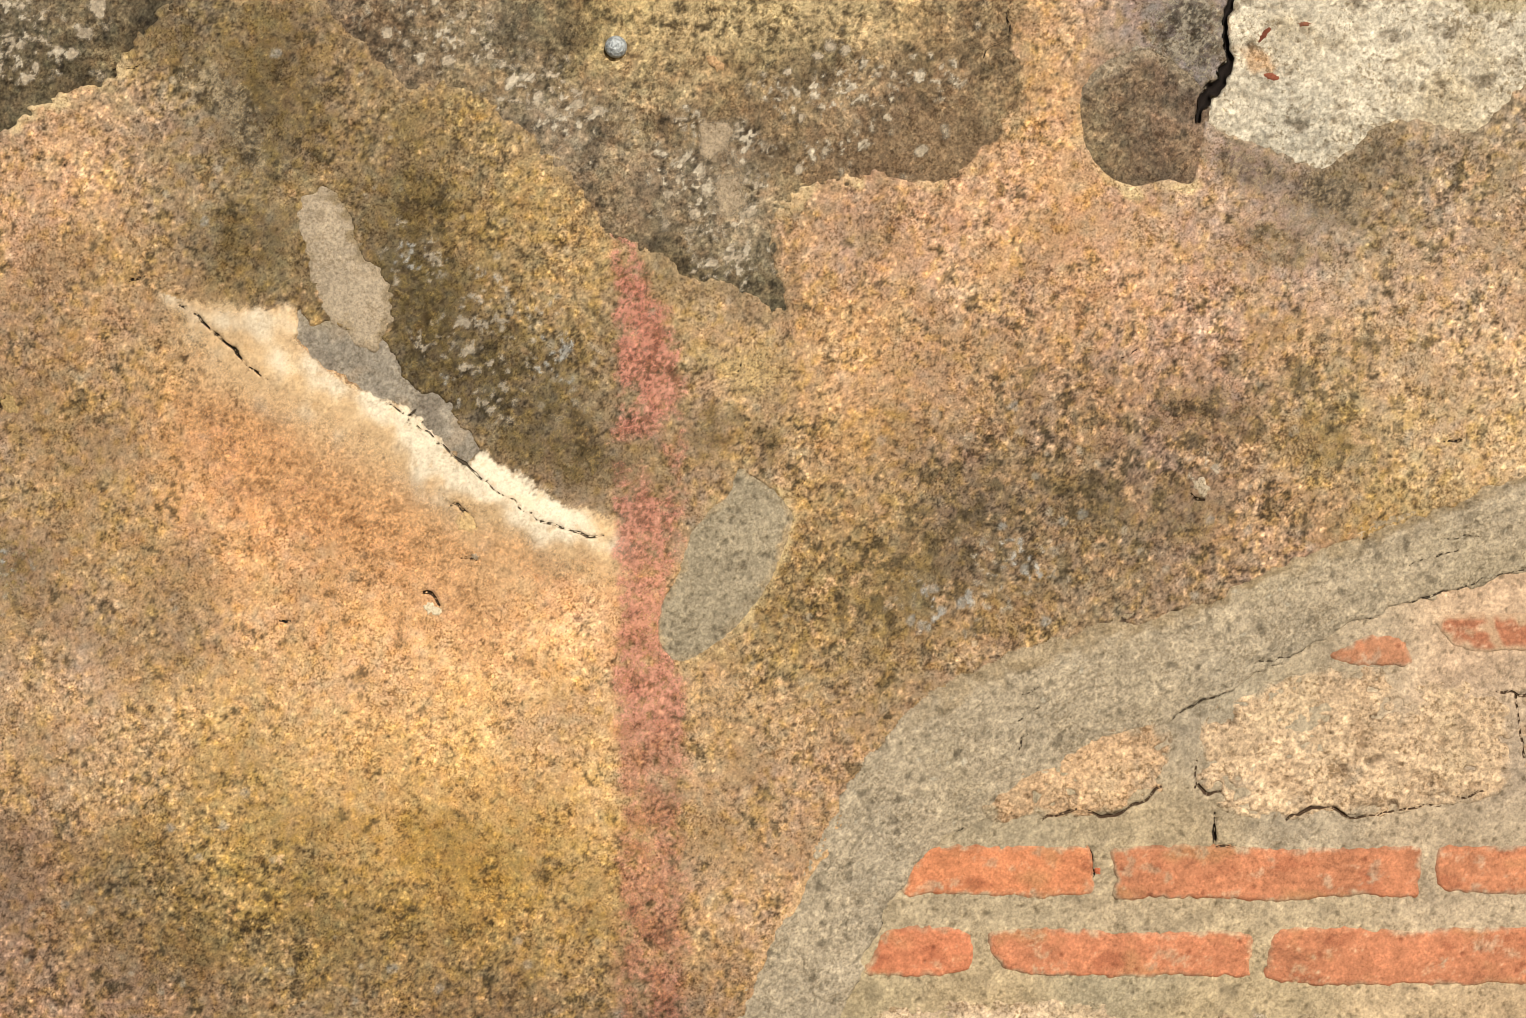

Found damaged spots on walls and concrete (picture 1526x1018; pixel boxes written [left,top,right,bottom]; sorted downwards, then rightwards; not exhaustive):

flaking render [0,0,174,132]
flaking render [318,0,1022,312]
crack [1196,0,1234,123]
flaking render [1080,0,1526,186]
flaking render [296,309,479,464]
damp [167,295,625,577]
crack [390,404,604,538]
flaking render [1191,477,1210,501]